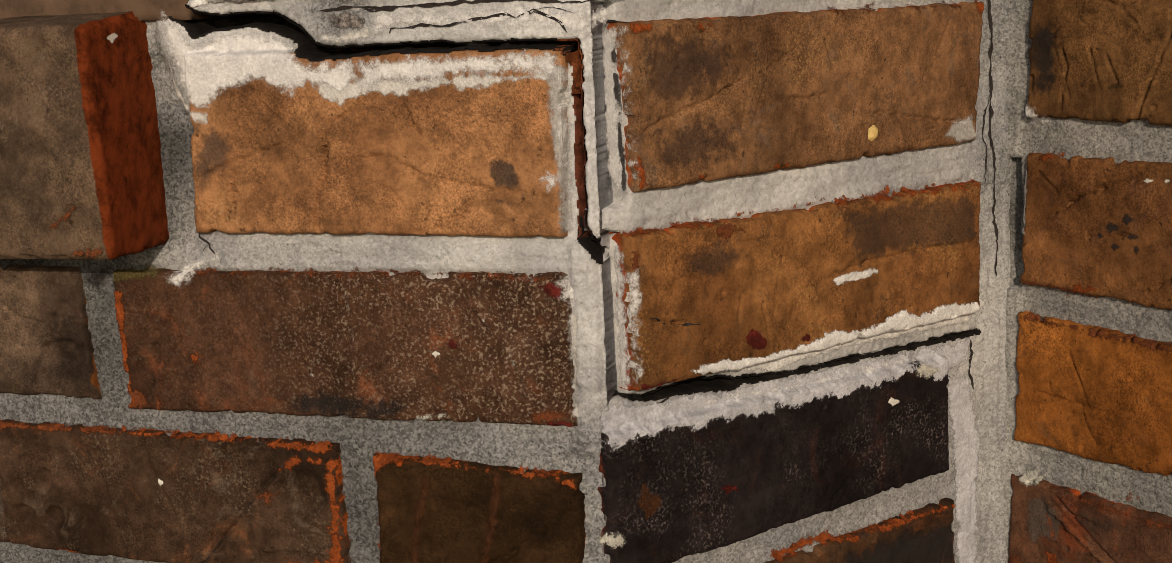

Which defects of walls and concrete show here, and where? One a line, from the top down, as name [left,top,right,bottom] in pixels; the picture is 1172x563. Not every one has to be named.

crack [168,0,629,265]
crack [982,0,998,276]
crack [612,328,981,404]